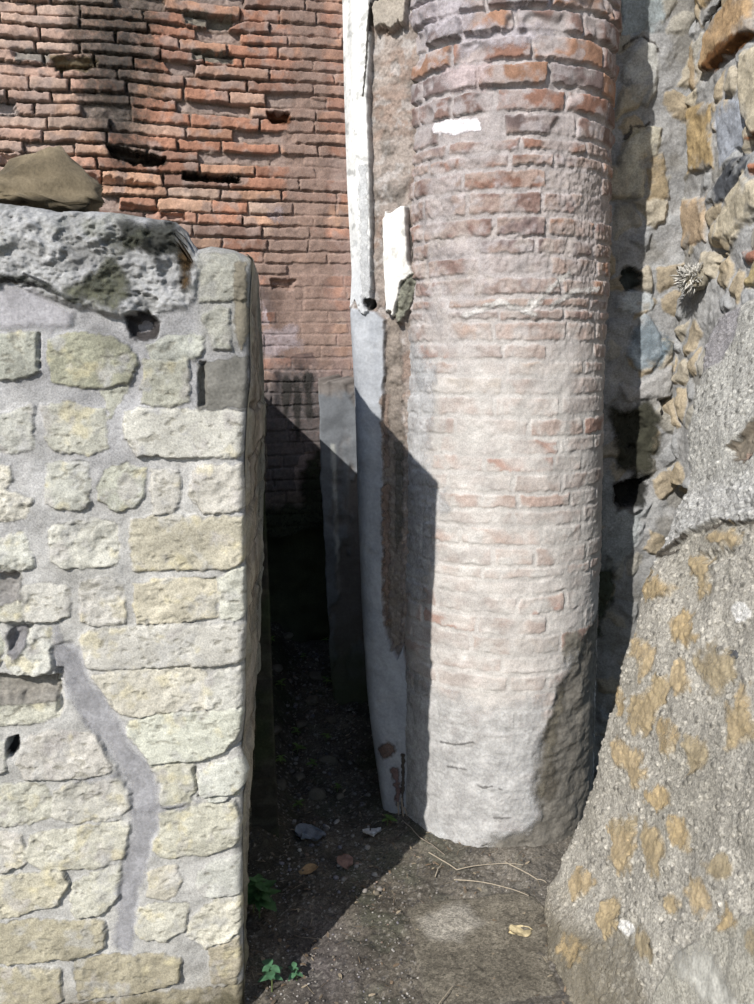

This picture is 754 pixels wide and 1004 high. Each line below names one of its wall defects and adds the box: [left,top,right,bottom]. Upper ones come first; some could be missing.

spalling [106,144,168,167]
spalling [182,170,241,185]
spalling [125,311,160,341]
water stain [251,372,320,495]
spalling [726,421,754,463]
flaking render [379,318,449,651]
rust [378,742,401,806]